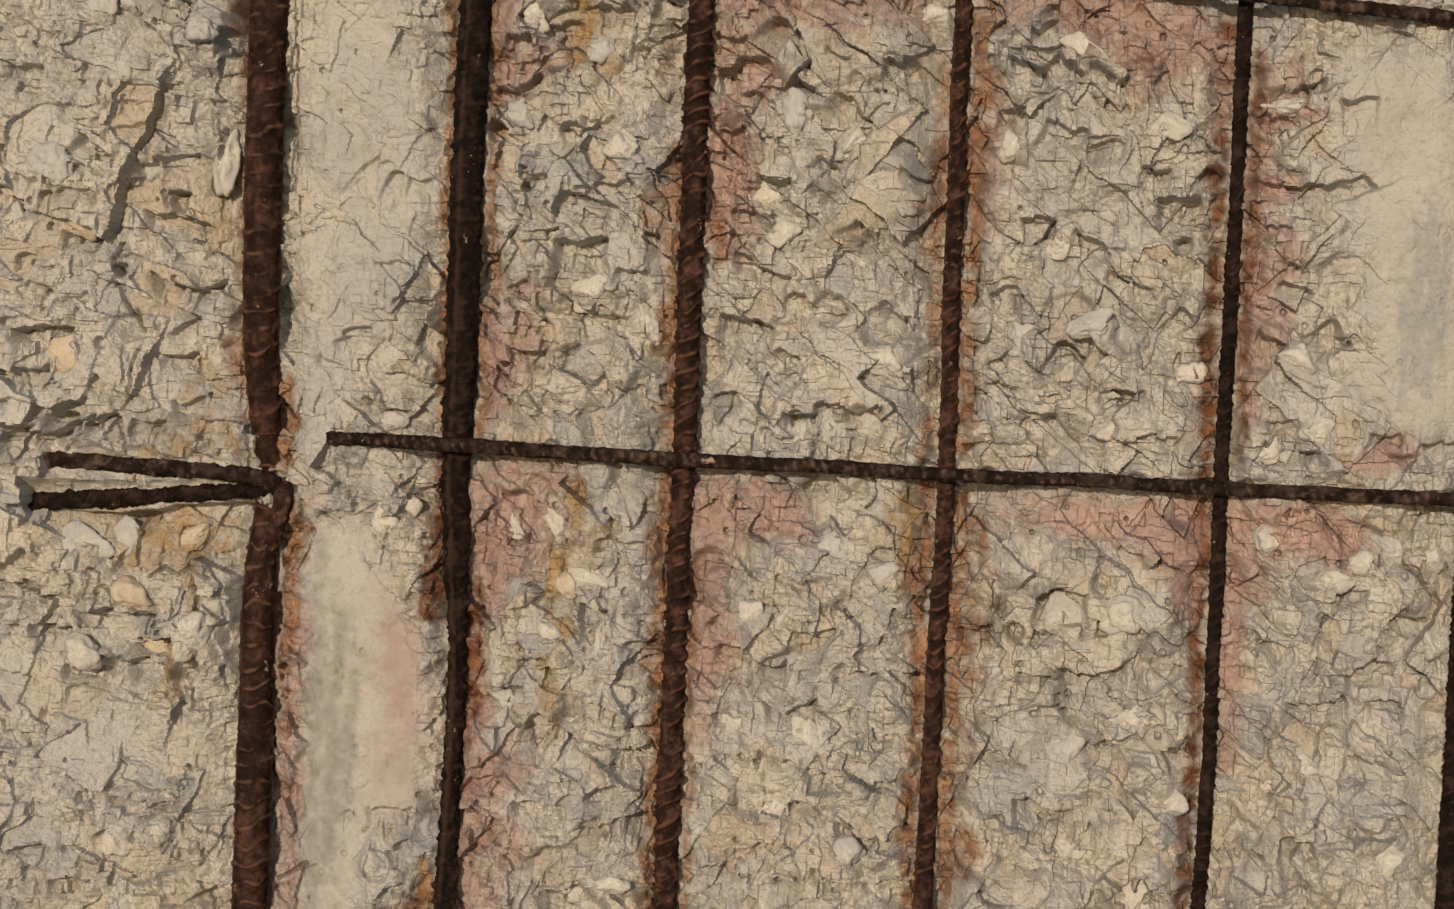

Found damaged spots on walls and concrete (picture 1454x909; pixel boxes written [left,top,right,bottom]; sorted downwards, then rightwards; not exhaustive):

spalling [0,325,112,504]
spalling [43,0,183,64]
spalling [32,497,282,909]
spalling [241,0,290,475]
corrosion [277,377,301,467]
corrosion [276,509,313,798]
spalling [363,397,415,431]
corrosion [434,0,459,422]
corrosion [638,142,683,909]
corrosion [887,480,993,909]
spalling [431,0,1454,909]
corrosion [928,0,1365,909]